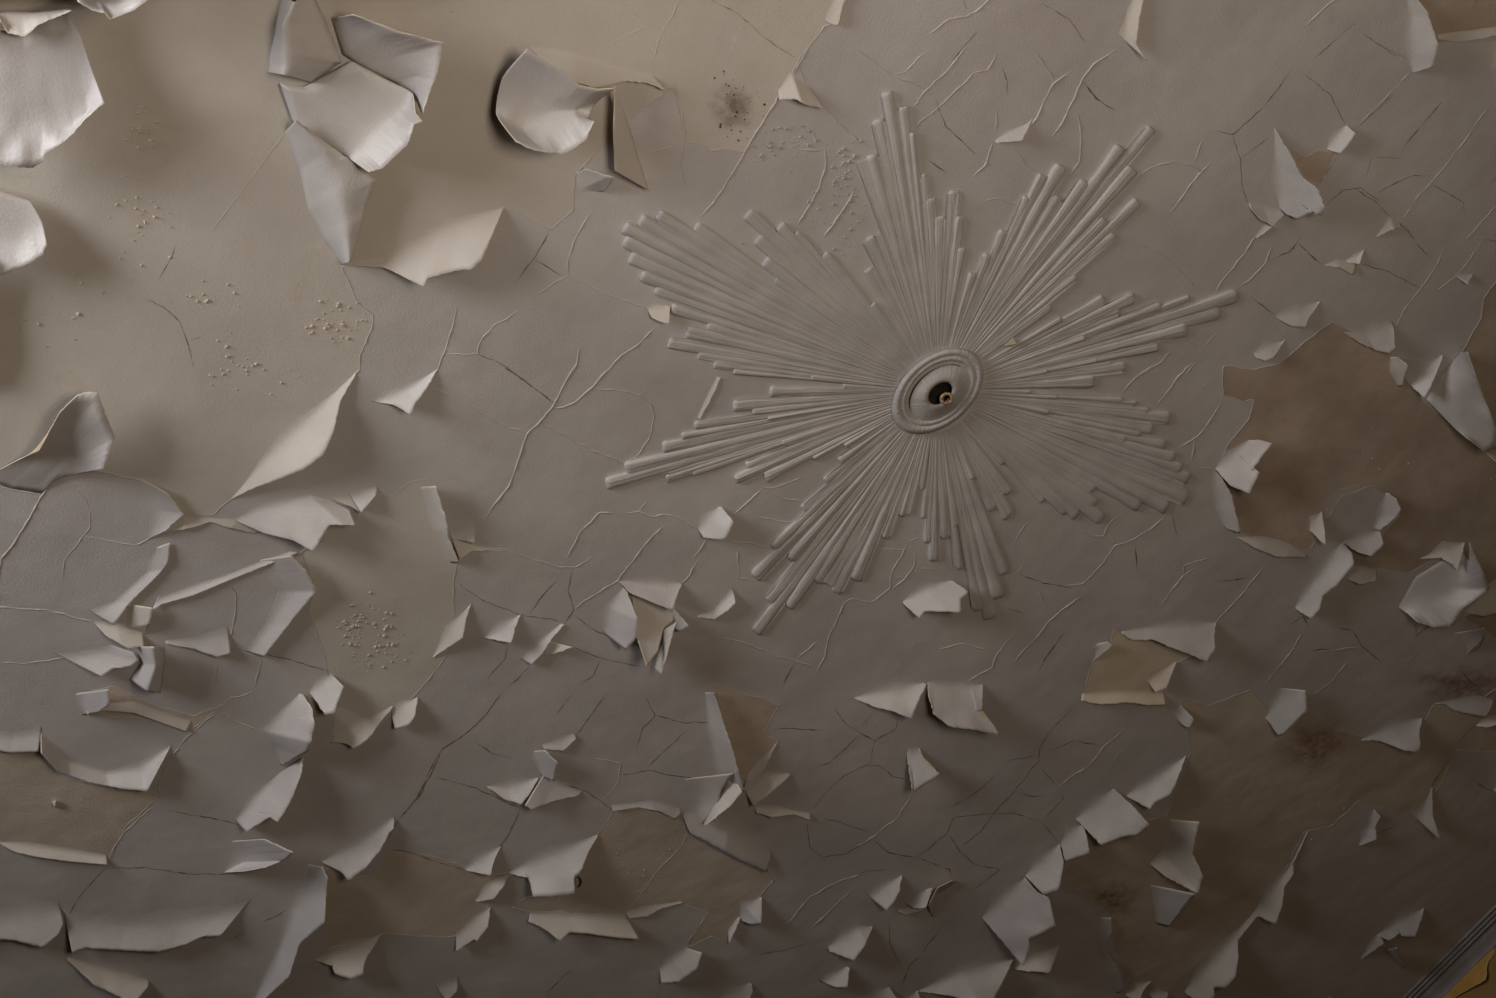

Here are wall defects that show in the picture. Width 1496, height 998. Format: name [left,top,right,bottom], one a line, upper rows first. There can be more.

crack [605,0,809,217]
crack [798,131,854,237]
crack [854,0,1115,207]
crack [0,482,163,664]
peeling [0,898,250,998]
crack [70,581,329,913]
peeling [0,0,847,873]
peeling [255,684,811,998]
crack [388,210,802,870]
peeling [903,580,969,618]
peeling [819,614,1496,998]
peeling [1212,282,1496,654]